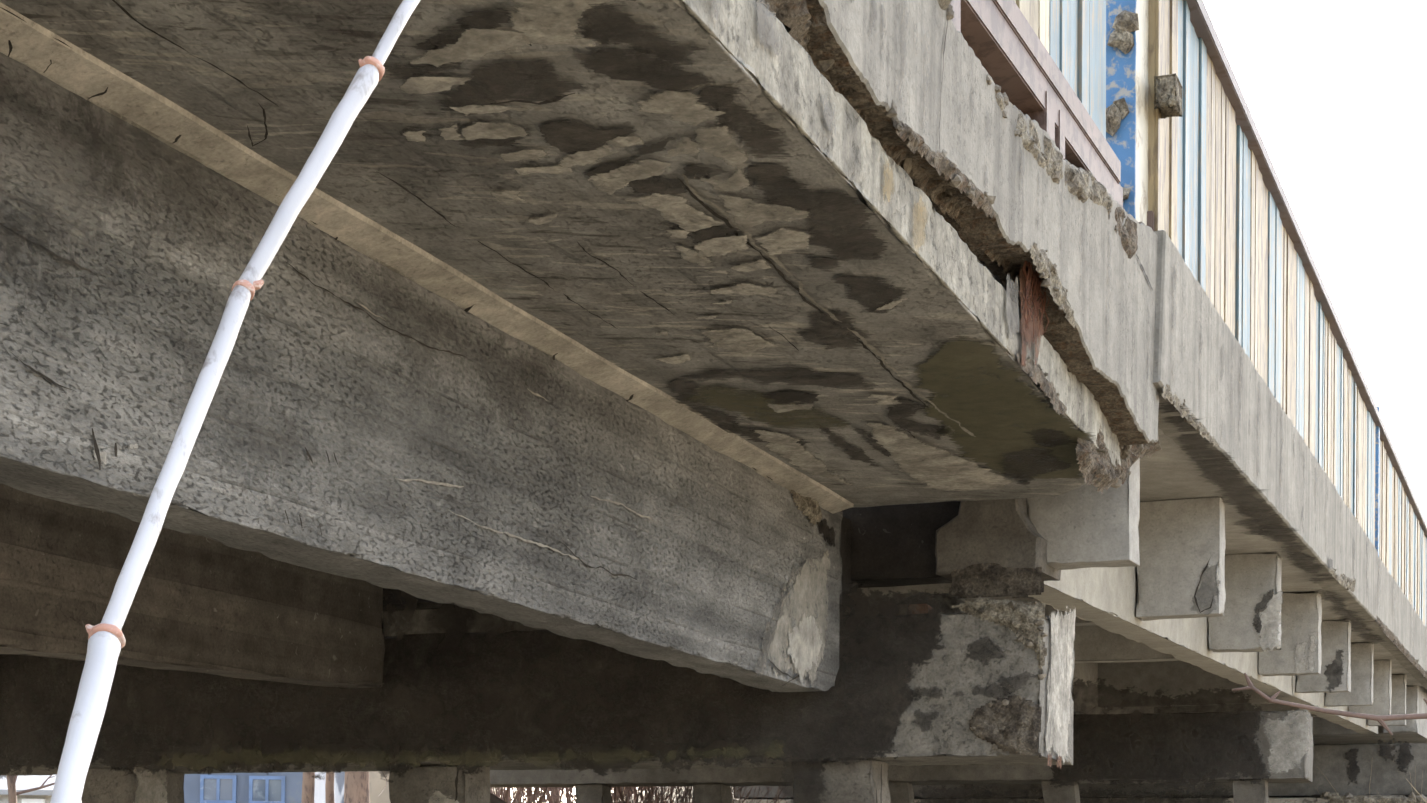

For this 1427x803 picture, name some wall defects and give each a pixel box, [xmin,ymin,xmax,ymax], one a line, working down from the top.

peeling [400,0,810,354]
water stain [385,0,905,349]
spalling [855,99,996,228]
spalling [986,74,1138,259]
crack [286,262,467,358]
crack [678,178,822,312]
water stain [664,365,891,467]
crack [857,339,926,466]
water stain [886,274,1105,485]
corrosion [1020,261,1050,367]
water stain [964,640,1000,663]
spalling [949,563,1076,763]